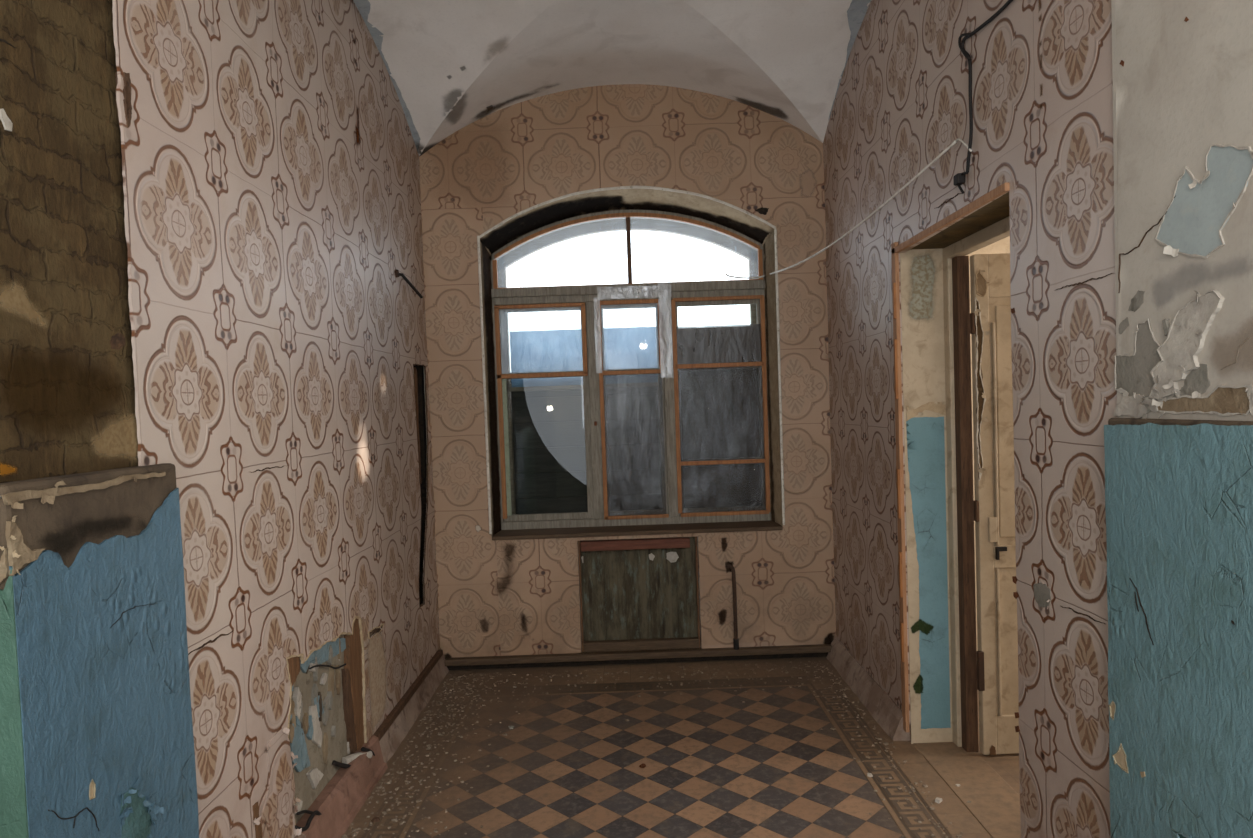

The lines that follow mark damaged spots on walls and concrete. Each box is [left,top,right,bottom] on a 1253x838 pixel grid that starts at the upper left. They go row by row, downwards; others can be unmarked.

peeling [829,0,873,119]
peeling [1154,144,1253,258]
peeling [1114,289,1253,419]
spalling [0,472,166,584]
spalling [282,616,367,836]